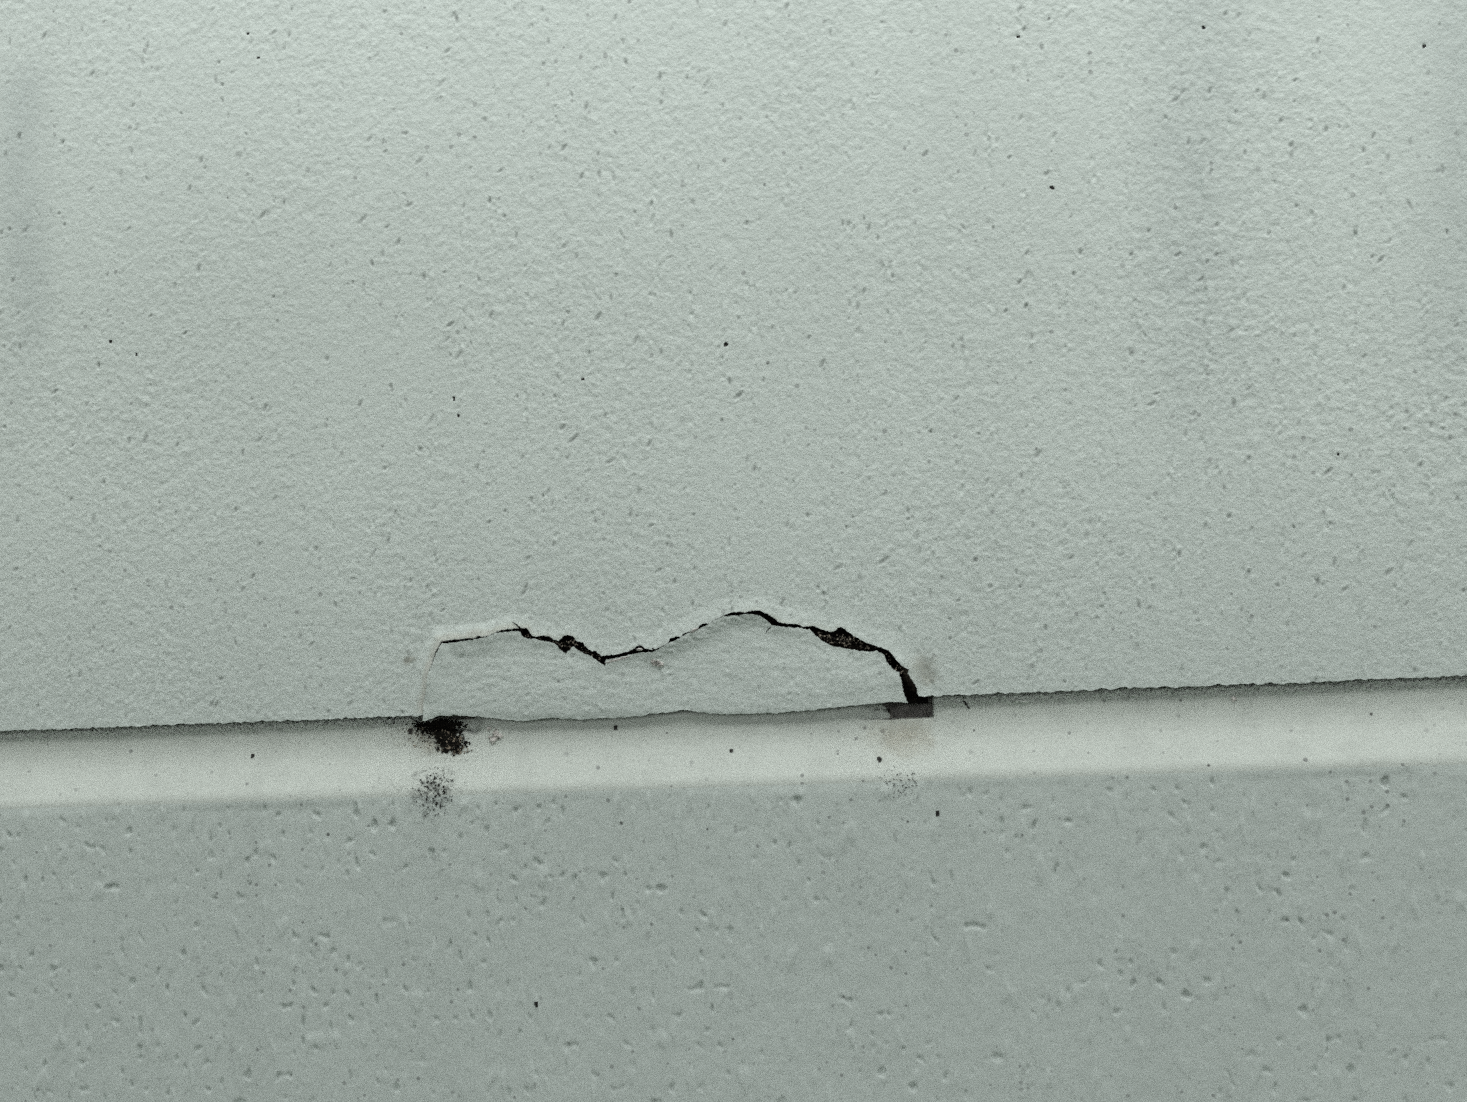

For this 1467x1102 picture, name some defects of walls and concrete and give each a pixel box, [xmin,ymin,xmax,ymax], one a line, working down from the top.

crack [419,610,928,713]